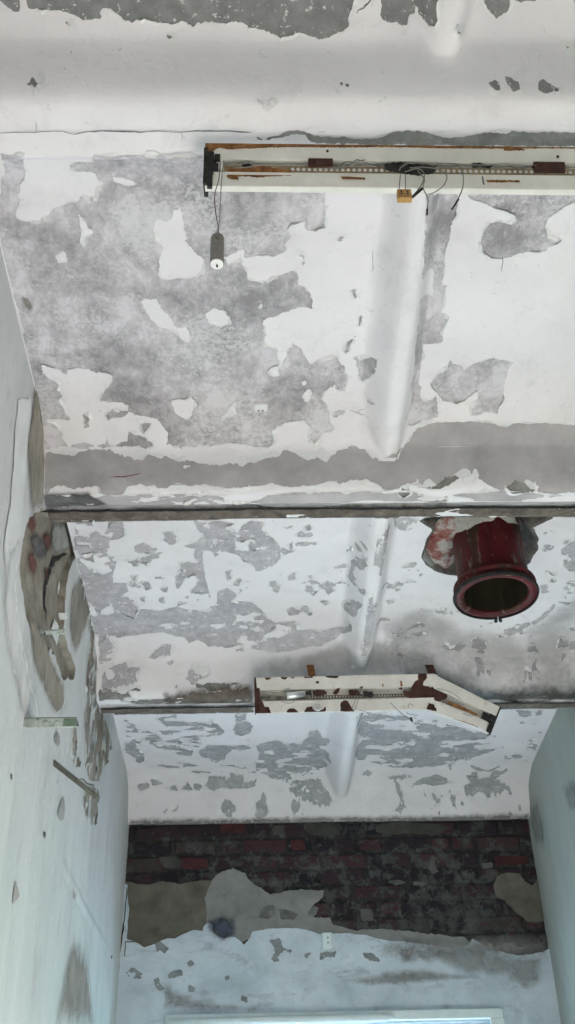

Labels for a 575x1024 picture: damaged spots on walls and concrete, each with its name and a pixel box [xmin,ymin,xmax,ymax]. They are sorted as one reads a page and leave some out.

peeling [0,0,357,46]
peeling [380,0,466,37]
peeling [483,0,536,19]
rust [205,143,575,151]
rust [227,166,292,180]
leakage [29,390,575,522]
peeling [0,151,575,962]
rust [349,684,384,698]
rust [400,681,478,727]